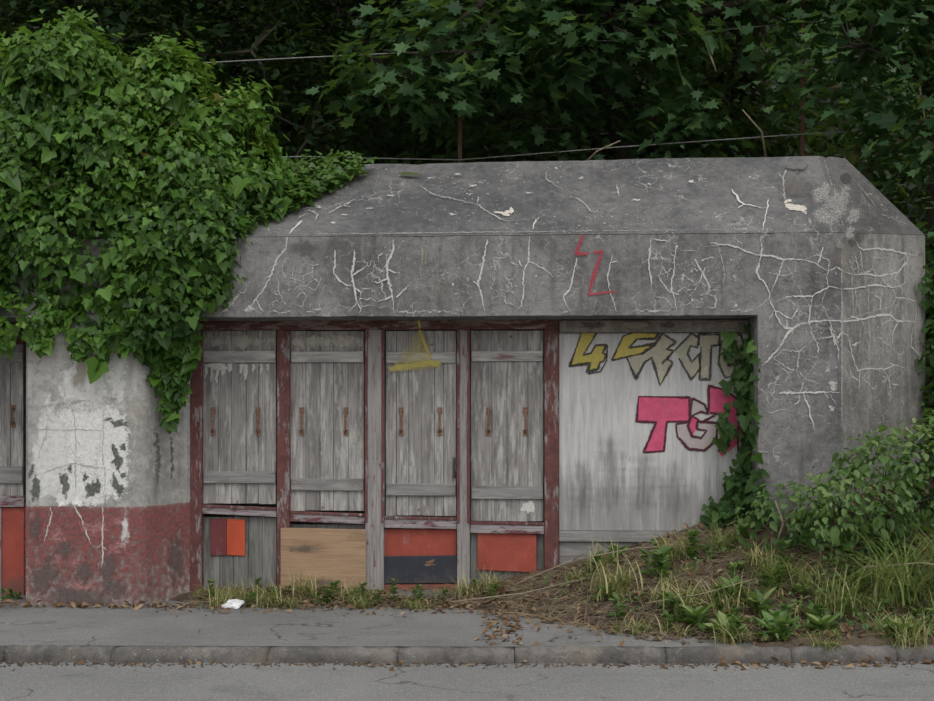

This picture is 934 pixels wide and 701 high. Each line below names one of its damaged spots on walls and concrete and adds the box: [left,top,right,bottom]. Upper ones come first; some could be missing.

crack [207,199,409,313]
crack [421,186,577,312]
crack [607,255,617,310]
crack [648,165,924,428]
peeling [29,343,131,507]
peeling [205,363,269,383]
crack [32,400,123,577]